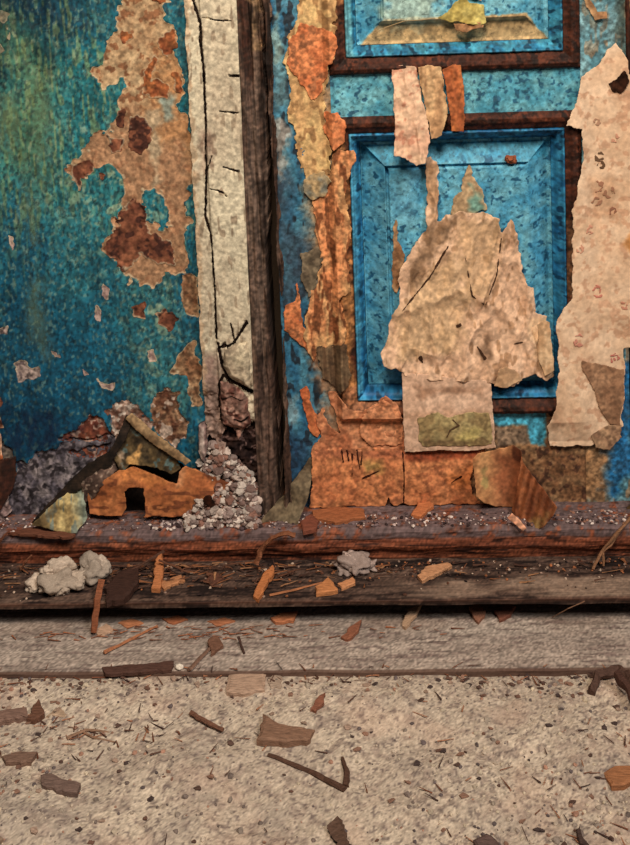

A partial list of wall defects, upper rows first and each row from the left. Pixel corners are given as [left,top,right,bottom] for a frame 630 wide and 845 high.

peeling [0,10,10,53]
rust [106,108,153,155]
peeling [64,0,200,322]
rust [103,198,176,272]
crack [192,0,253,429]
peeling [282,0,356,395]
peeling [391,220,405,293]
peeling [451,165,487,215]
spalling [2,340,203,515]
spalling [208,421,258,482]
peeling [300,386,321,438]